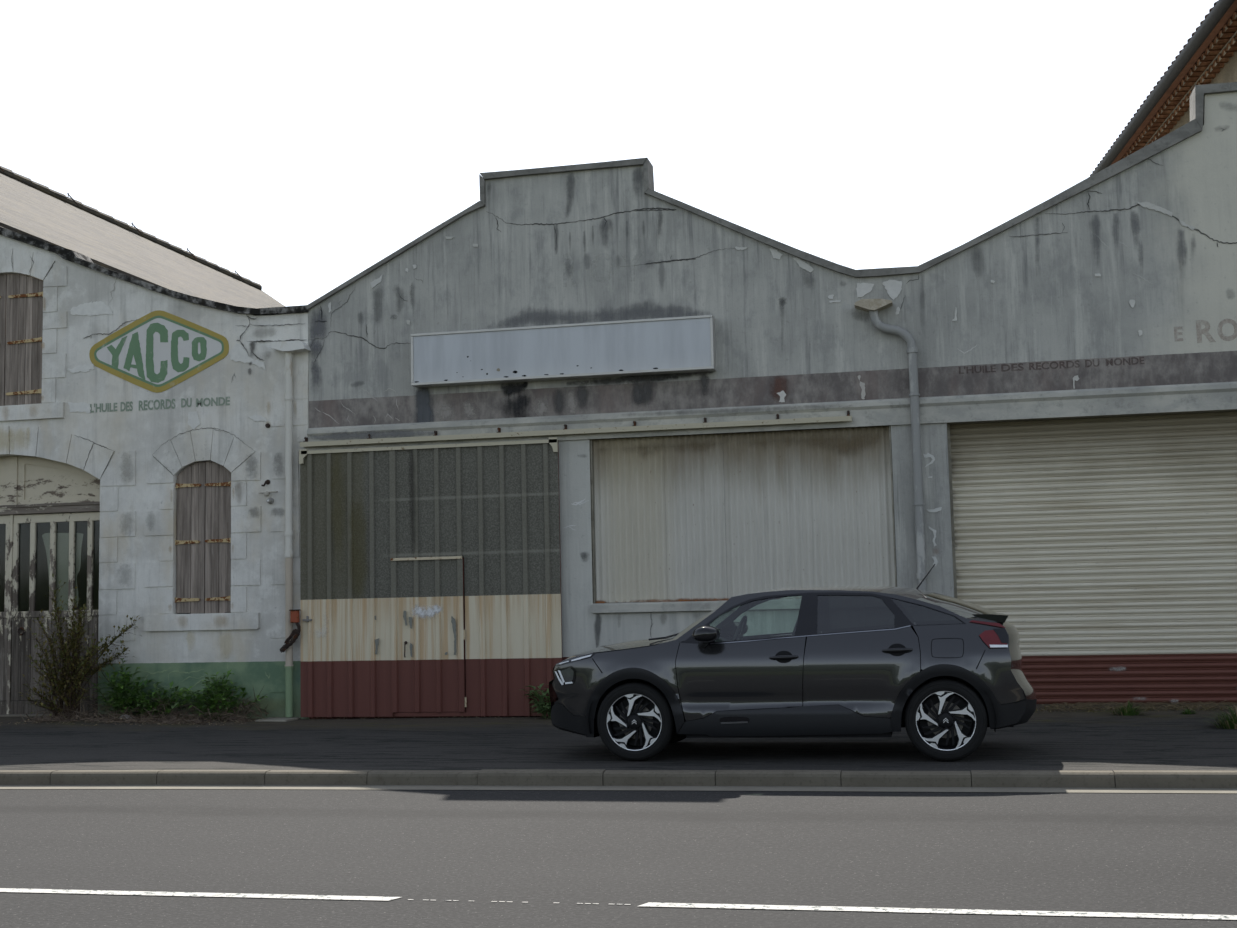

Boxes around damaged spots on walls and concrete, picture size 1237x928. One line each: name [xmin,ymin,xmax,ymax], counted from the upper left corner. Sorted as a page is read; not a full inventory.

crack [493,208,677,251]
crack [1010,191,1140,237]
crack [1172,215,1237,247]
crack [620,248,732,267]
damp [507,303,693,326]
peeling [856,280,902,315]
damp [311,312,324,382]
crack [232,289,406,381]
damp [314,388,433,439]
damp [501,382,528,418]
damp [554,372,710,412]
peeling [445,616,457,655]